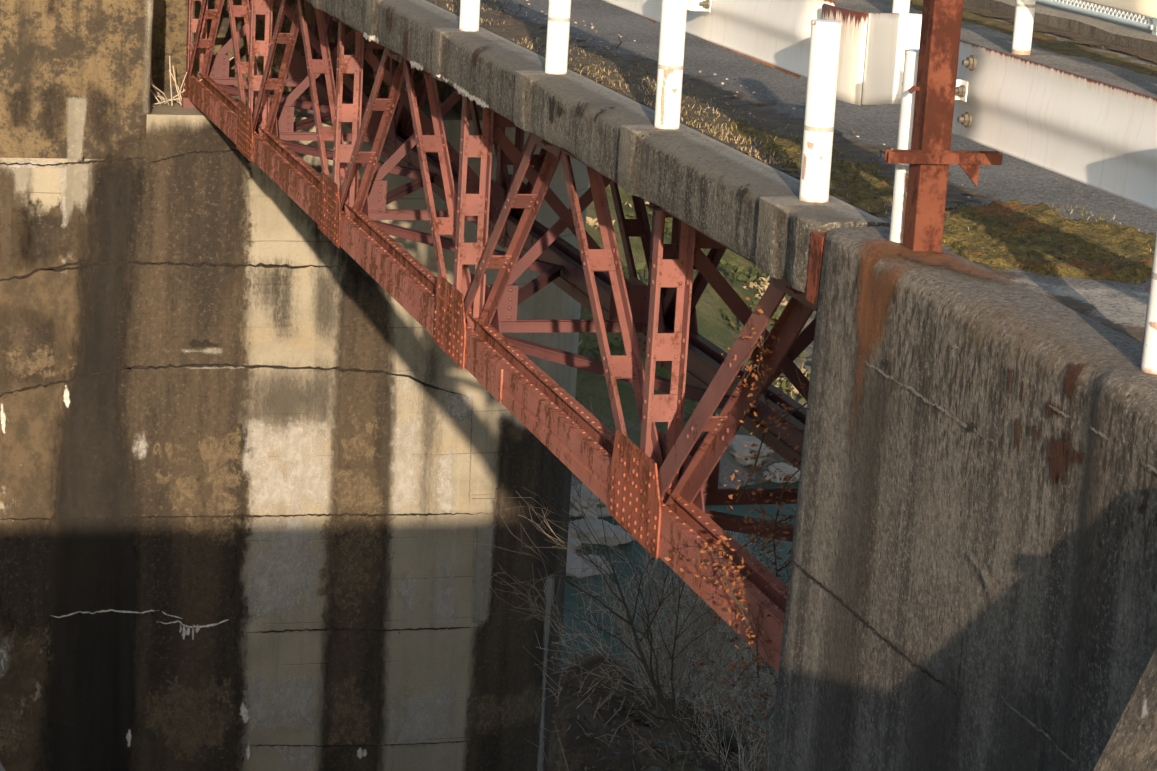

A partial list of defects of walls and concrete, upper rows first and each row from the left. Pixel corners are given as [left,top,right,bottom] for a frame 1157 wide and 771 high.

leakage [0,88,454,771]
crack [0,363,492,633]
leakage [465,420,572,771]
rust [854,174,1010,404]
rust [1013,362,1088,486]